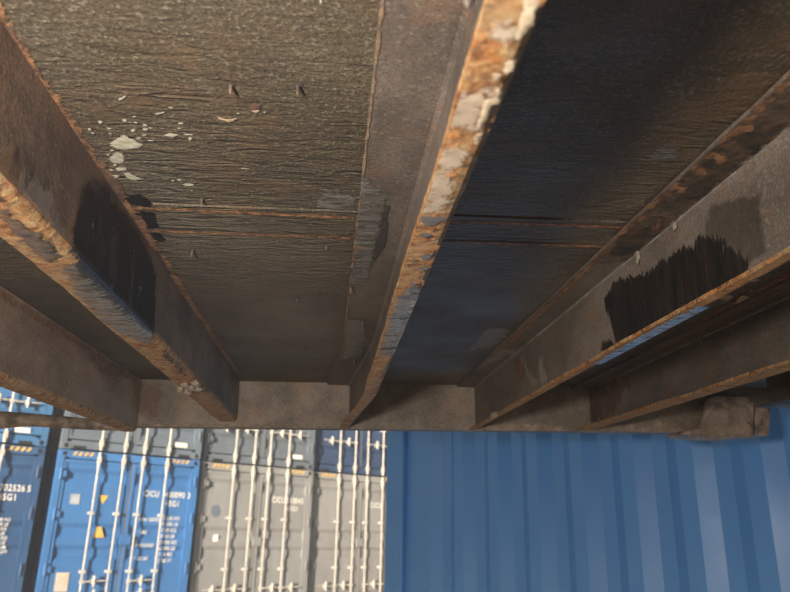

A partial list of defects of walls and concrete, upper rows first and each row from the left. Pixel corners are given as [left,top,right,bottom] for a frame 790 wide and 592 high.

peeling [514,0,541,40]
peeling [473,60,516,145]
peeling [98,116,153,180]
spalling [372,205,390,261]
spalling [420,216,447,238]